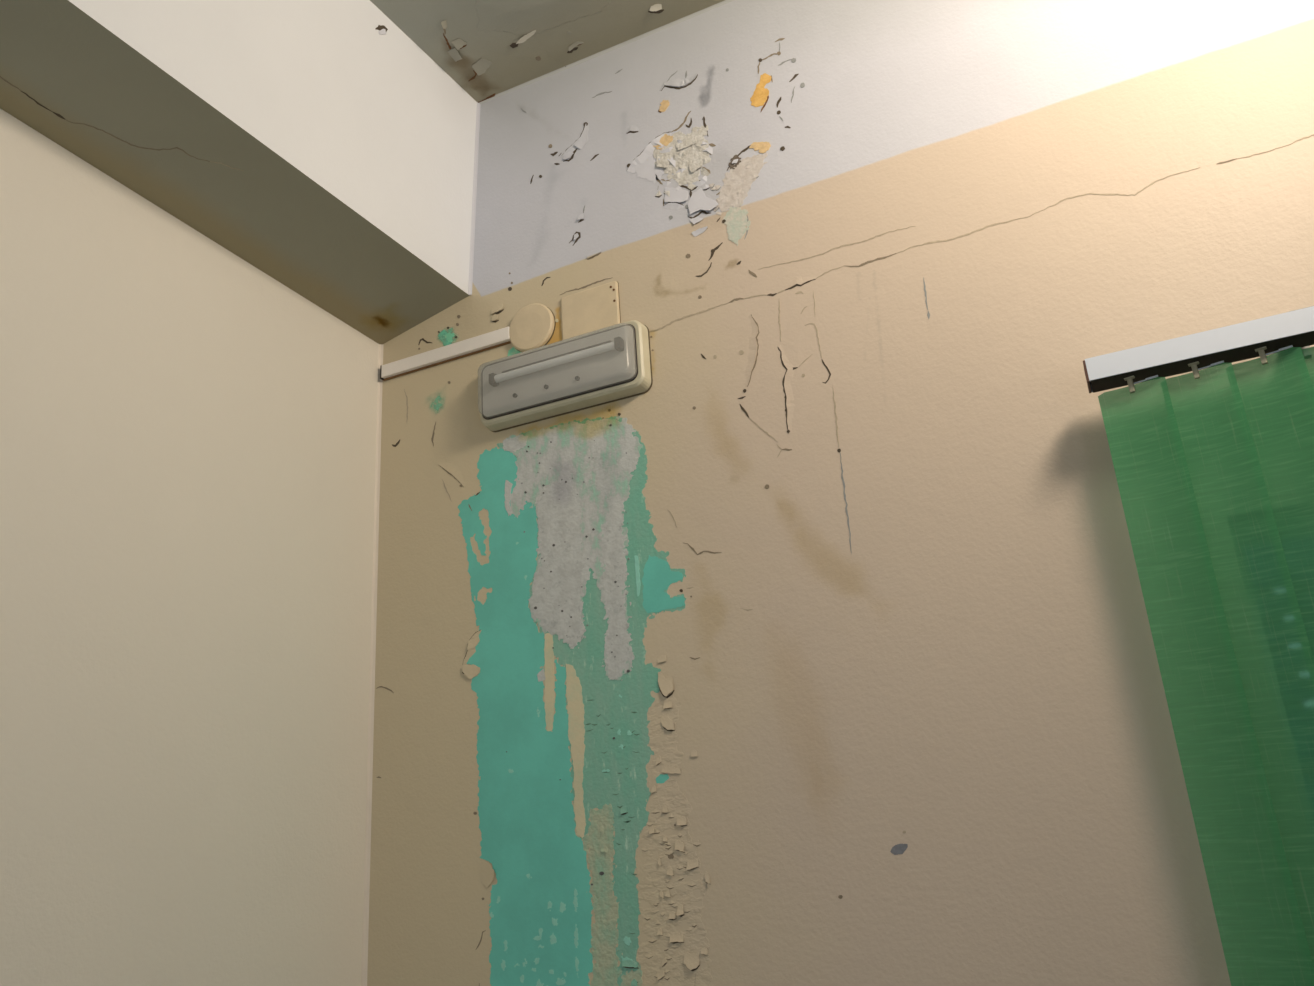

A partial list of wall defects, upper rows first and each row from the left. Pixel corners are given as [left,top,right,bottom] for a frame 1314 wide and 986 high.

crack [0,76,243,171]
peeling [441,20,493,81]
peeling [510,30,536,48]
peeling [648,4,664,14]
peeling [658,71,698,113]
peeling [750,38,785,111]
peeling [627,111,771,246]
crack [649,134,1314,555]
peeling [458,416,686,986]